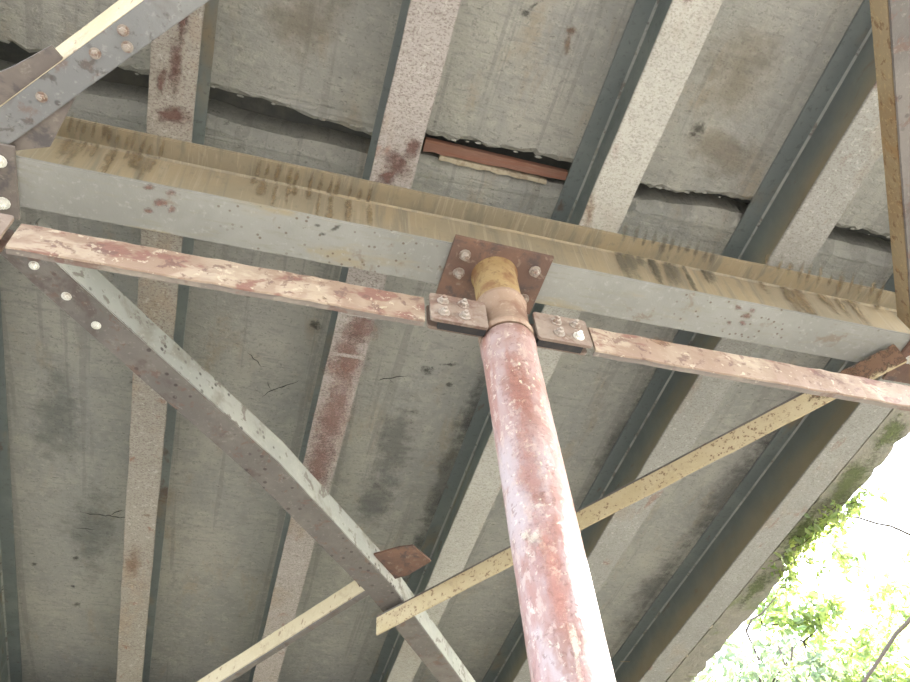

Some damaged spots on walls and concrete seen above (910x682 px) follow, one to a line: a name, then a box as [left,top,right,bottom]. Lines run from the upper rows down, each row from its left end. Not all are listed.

corrosion [158,46,181,91]
corrosion [158,108,187,123]
corrosion [380,139,420,184]
corrosion [306,317,375,482]
crack [77,510,125,530]